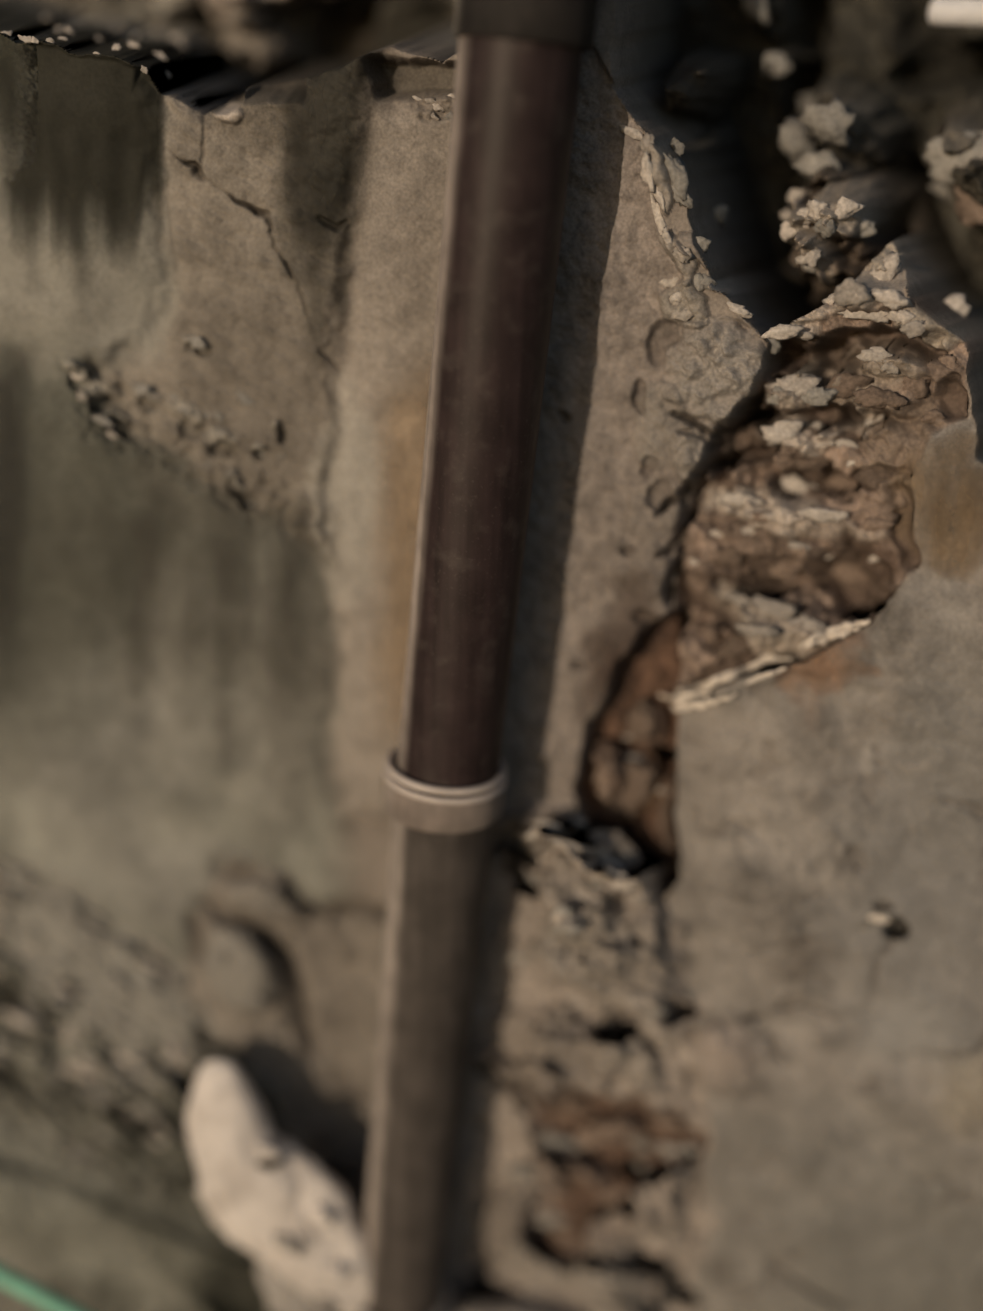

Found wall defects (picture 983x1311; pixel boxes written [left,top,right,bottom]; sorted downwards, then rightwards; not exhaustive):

water stain [0,0,203,237]
crack [164,114,343,372]
spalling [60,361,333,546]
spalling [518,0,983,937]
spalling [856,896,915,948]
spalling [526,1089,709,1260]